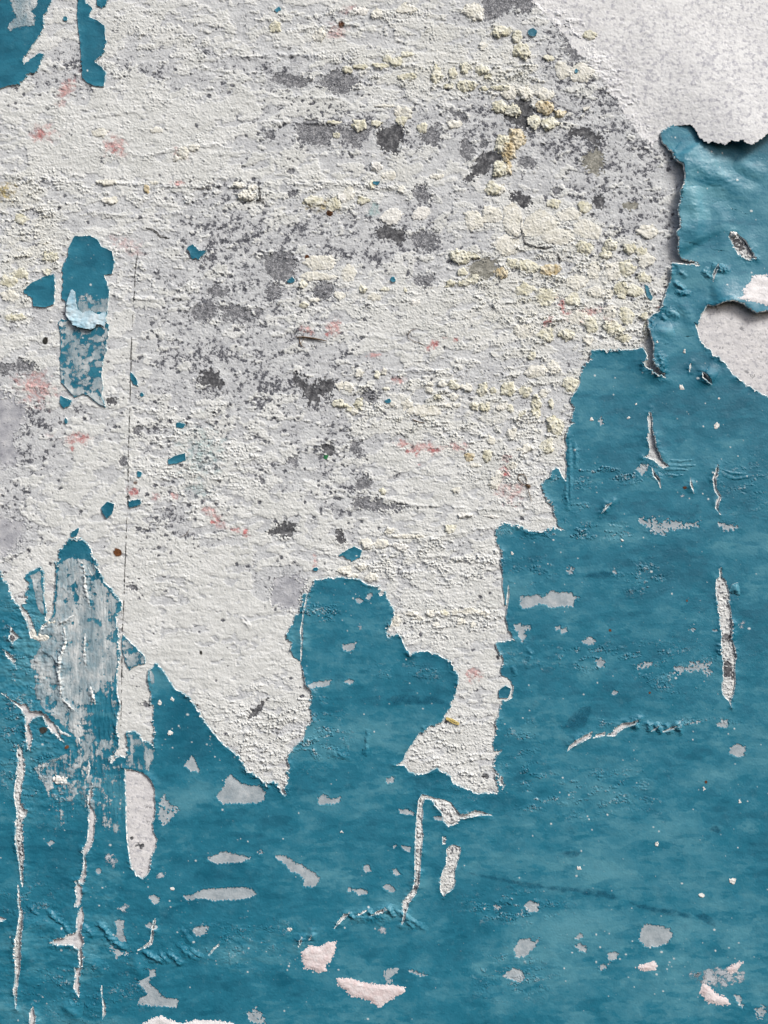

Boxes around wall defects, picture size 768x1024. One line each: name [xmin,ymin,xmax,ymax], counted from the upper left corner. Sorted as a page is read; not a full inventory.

peeling [0,0,768,795]
peeling [36,750,119,833]
peeling [125,734,178,878]
peeling [216,775,266,805]
peeling [440,837,460,894]